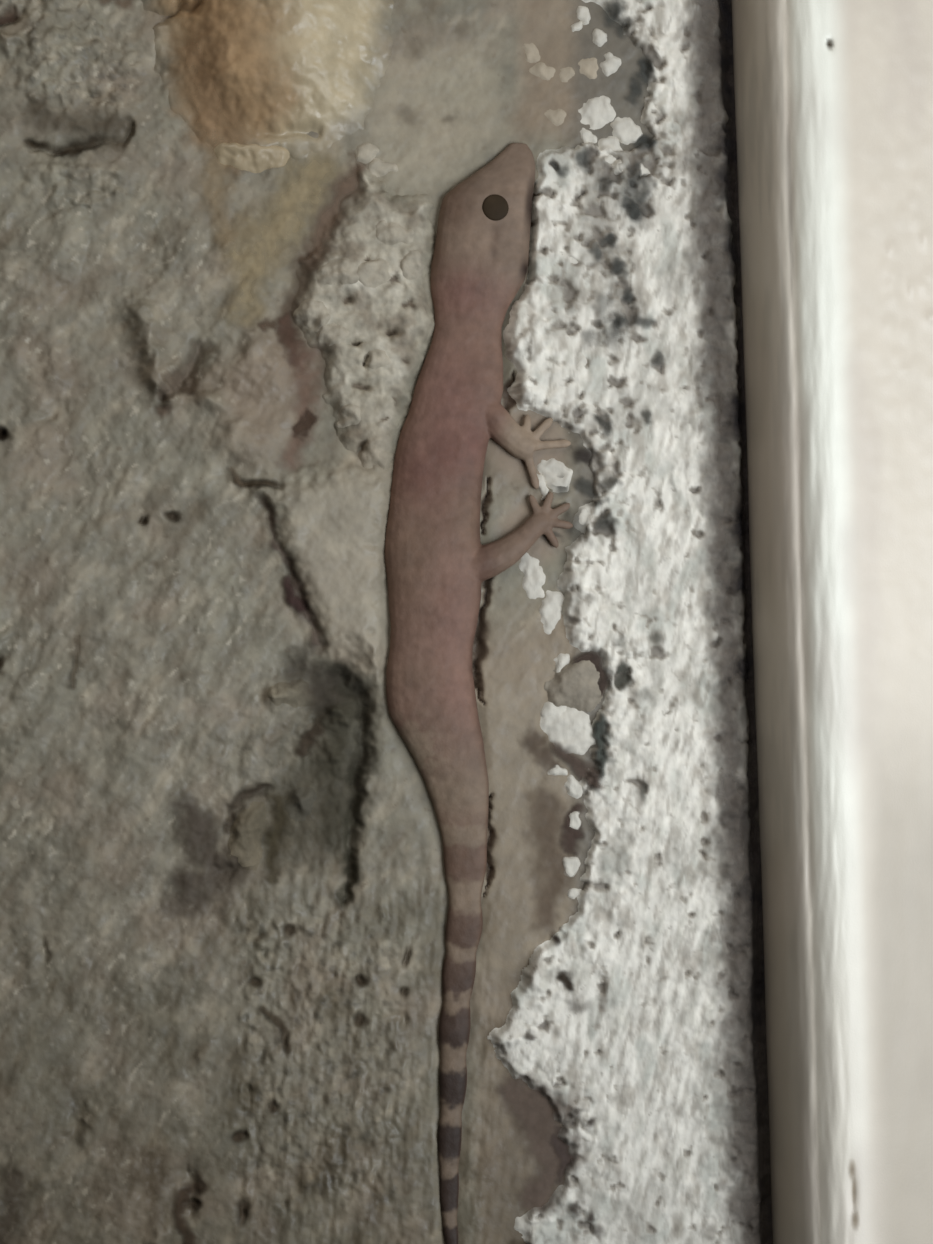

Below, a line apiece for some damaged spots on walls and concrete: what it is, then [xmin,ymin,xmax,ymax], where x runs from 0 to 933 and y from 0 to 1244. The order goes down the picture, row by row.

spalling [0,9,19,25]
corrosion [168,0,287,150]
flaking render [291,143,436,470]
crack [230,467,320,645]
spalling [224,665,368,907]
water stain [174,803,244,911]
spalling [285,925,297,936]
crack [174,1180,206,1244]
spalling [240,1200,250,1224]